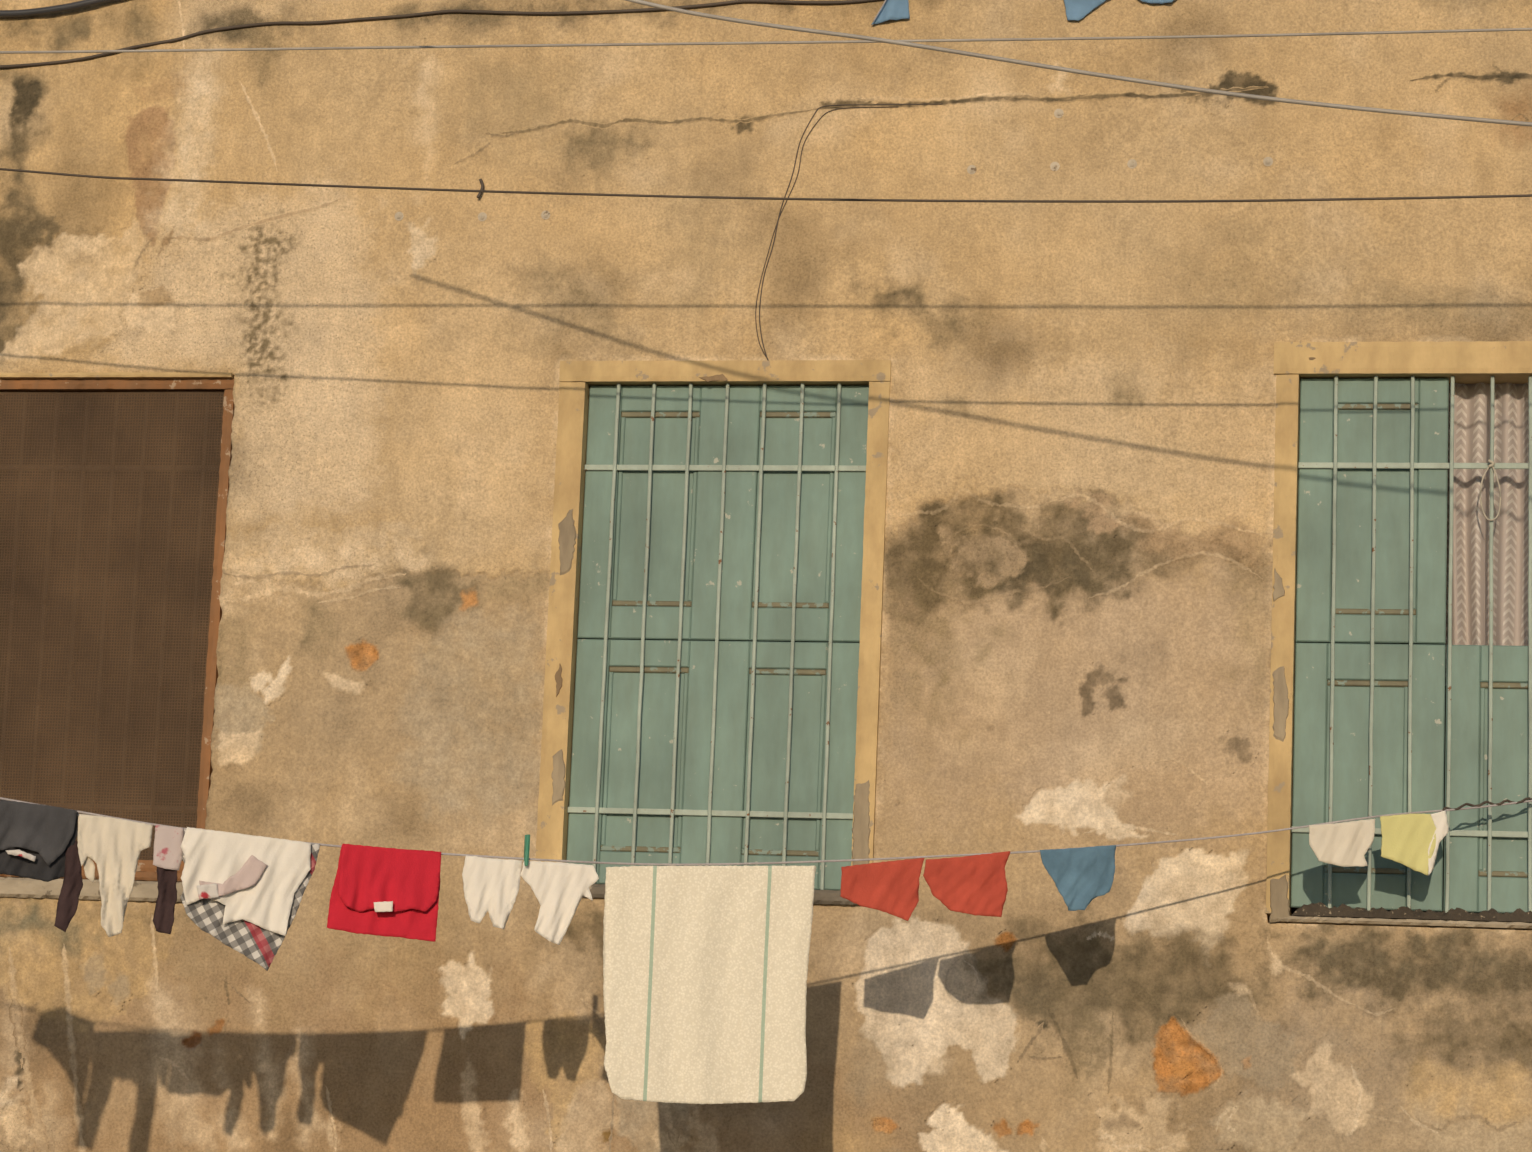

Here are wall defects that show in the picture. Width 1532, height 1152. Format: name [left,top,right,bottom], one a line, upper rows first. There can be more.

crack [453,86,1269,165]
water stain [0,0,300,373]
water stain [880,471,1273,765]
spalling [318,637,381,696]
flaking render [212,654,295,770]
peeling [1189,847,1224,878]
spalling [991,929,1020,955]
flaking render [1088,985,1419,1152]
flaking render [916,1101,1042,1152]